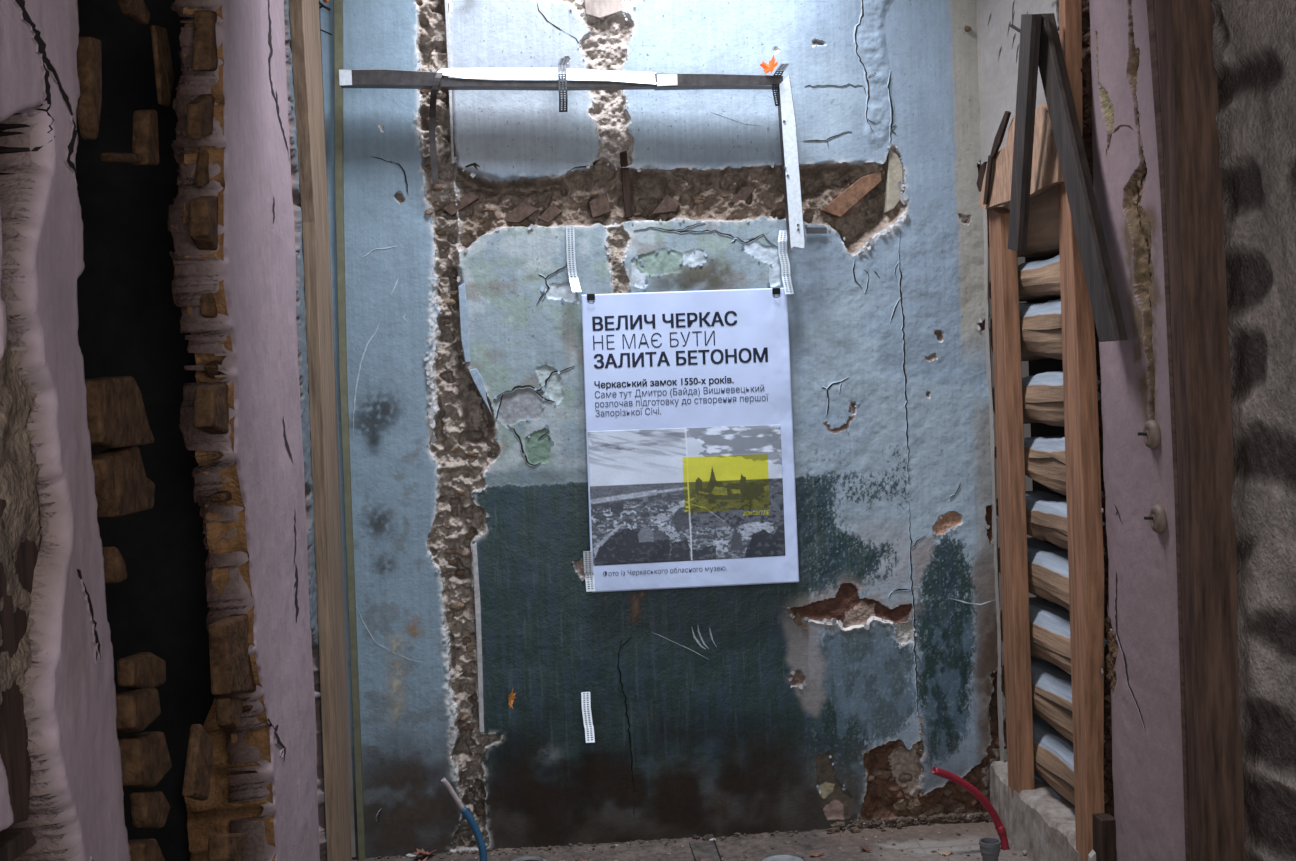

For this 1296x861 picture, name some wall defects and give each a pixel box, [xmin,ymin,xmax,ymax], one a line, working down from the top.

crack [0,0,78,186]
crack [804,0,896,147]
spalling [605,221,707,294]
peeling [741,218,781,288]
peeling [858,181,910,257]
crack [1122,0,1155,420]
peeling [424,352,435,444]
spalling [932,511,963,536]
spalling [787,583,918,649]
spalling [816,666,1007,827]